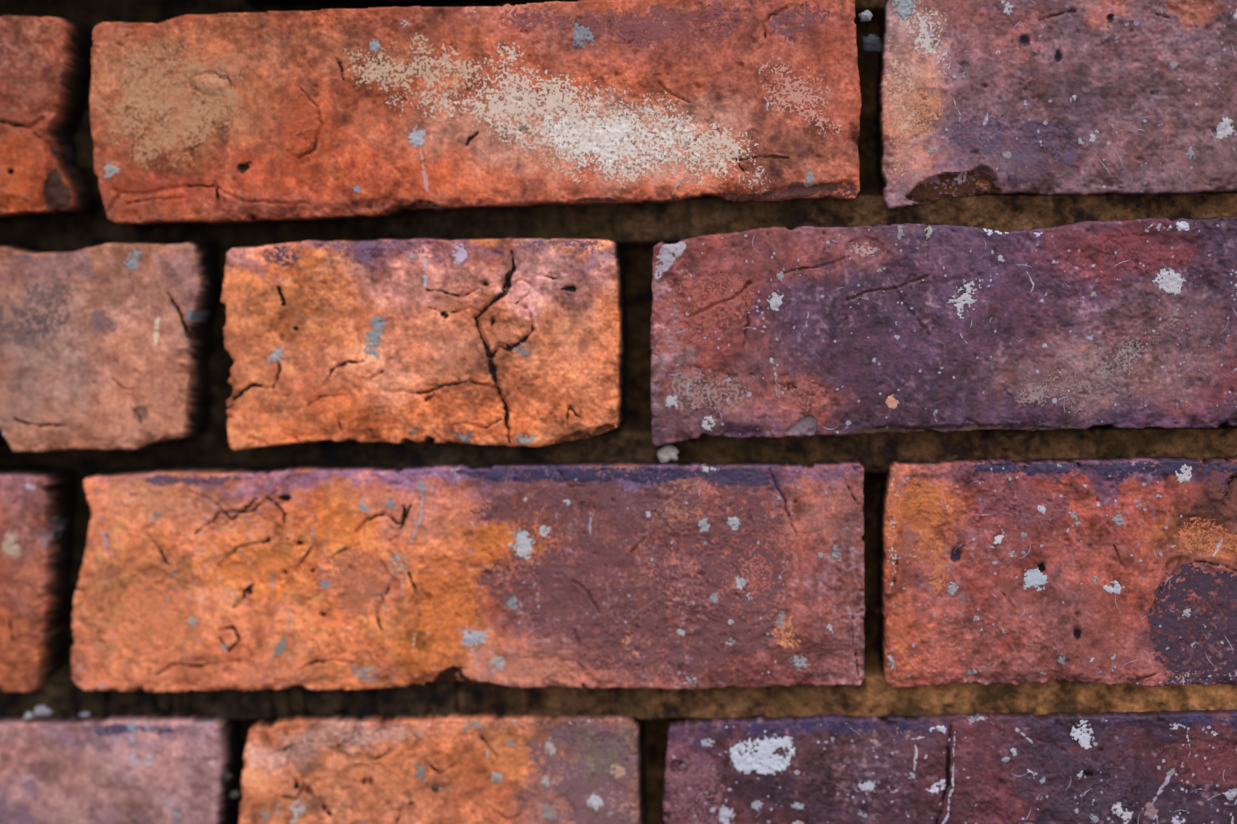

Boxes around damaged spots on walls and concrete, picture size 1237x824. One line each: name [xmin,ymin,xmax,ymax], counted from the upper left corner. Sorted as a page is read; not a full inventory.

leakage [341,33,771,195]
crack [277,286,286,307]
crack [230,361,282,403]
crack [308,360,384,431]
crack [416,251,534,443]
crack [566,405,581,426]
crack [194,497,286,567]
crack [299,504,412,565]
crack [155,584,255,676]
crack [376,571,417,630]
spalling [1146,517,1237,686]
crack [935,732,950,824]